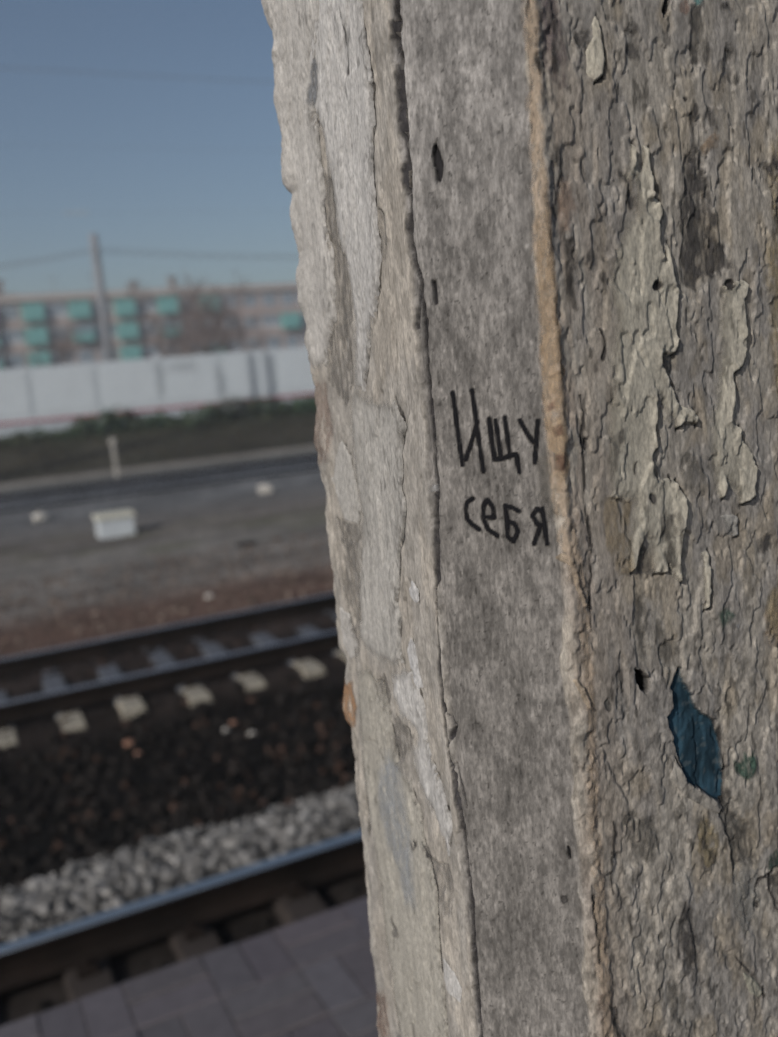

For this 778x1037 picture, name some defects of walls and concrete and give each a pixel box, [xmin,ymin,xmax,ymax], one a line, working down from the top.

crack [340,0,441,610]
peeling [609,102,758,583]
peeling [701,551,712,609]
crack [425,848,443,972]
crack [438,646,483,1037]
peeling [670,759,755,866]
crack [753,870,778,911]